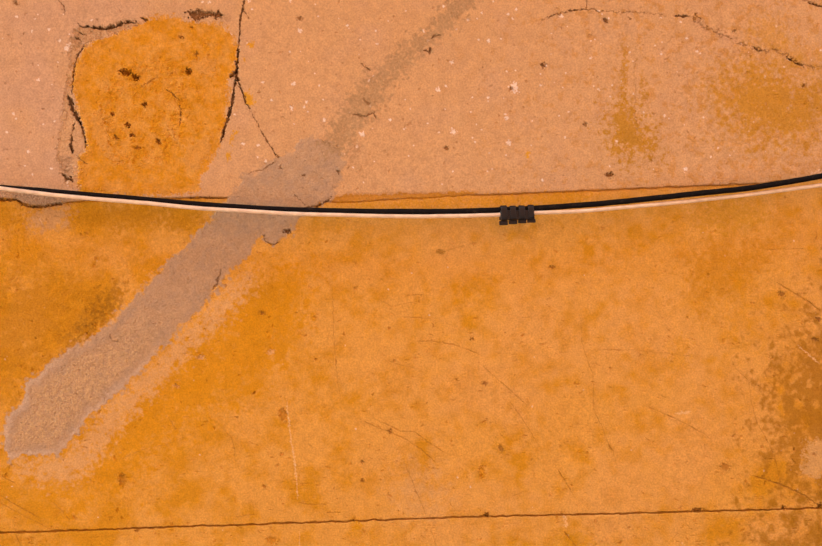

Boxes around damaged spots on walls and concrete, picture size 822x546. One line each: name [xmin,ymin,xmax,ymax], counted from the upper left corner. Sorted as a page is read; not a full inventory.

spalling [54,18,142,191]
spalling [178,8,233,39]
crack [219,0,280,178]
crack [536,0,822,71]